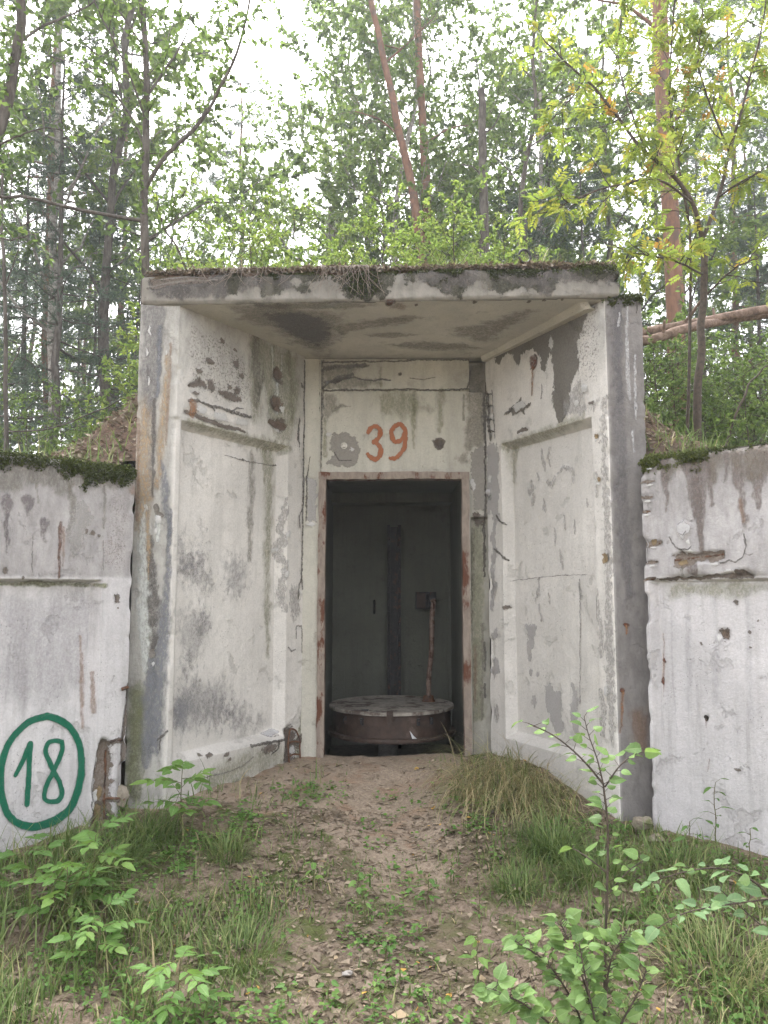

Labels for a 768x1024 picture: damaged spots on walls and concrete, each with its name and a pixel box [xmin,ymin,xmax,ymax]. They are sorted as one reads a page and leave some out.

spalling [184,332,250,433]
spalling [268,366,288,432]
spalling [326,432,361,468]
leakage [2,494,34,547]
leakage [137,274,292,768]
flaking render [494,306,616,742]
spalling [644,539,754,584]
leakage [655,444,768,576]
spalling [90,683,129,825]